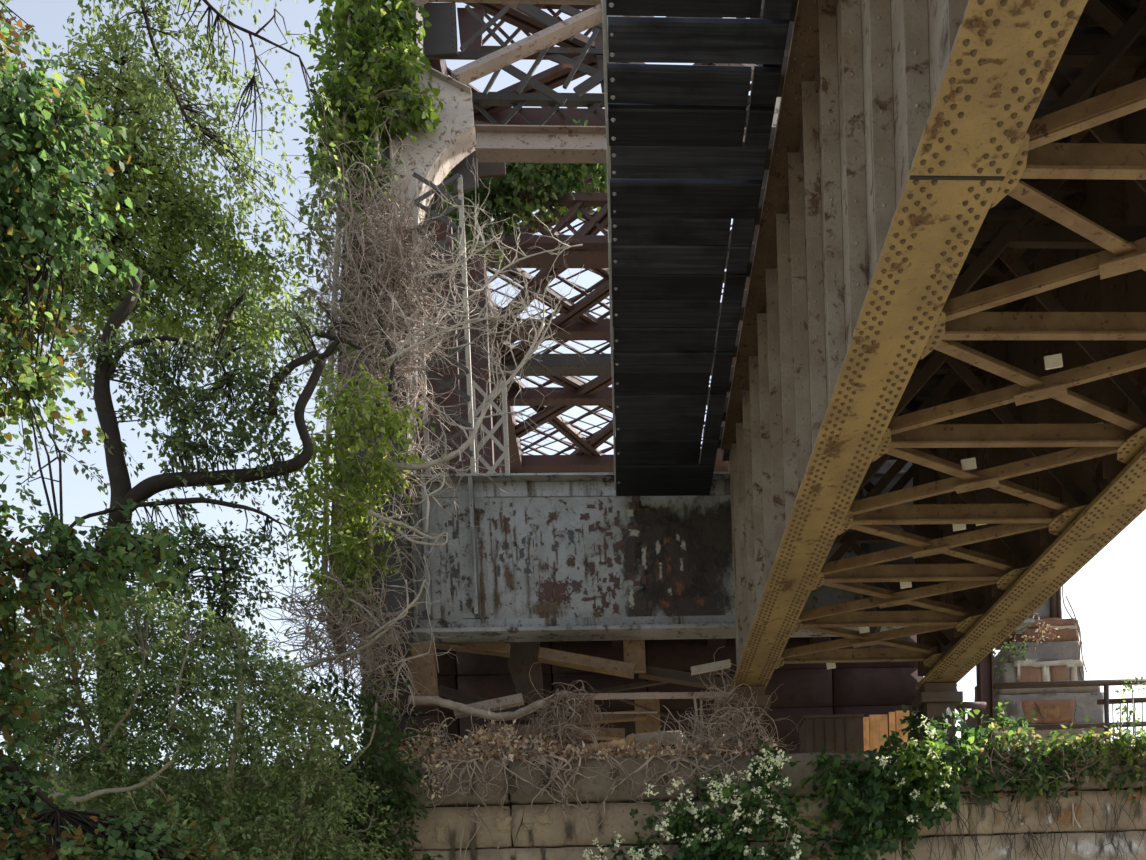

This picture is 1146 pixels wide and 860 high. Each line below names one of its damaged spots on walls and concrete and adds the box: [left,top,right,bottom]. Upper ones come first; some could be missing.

peeling [445,501,463,615]
peeling [489,496,672,617]
corrosion [441,500,733,622]